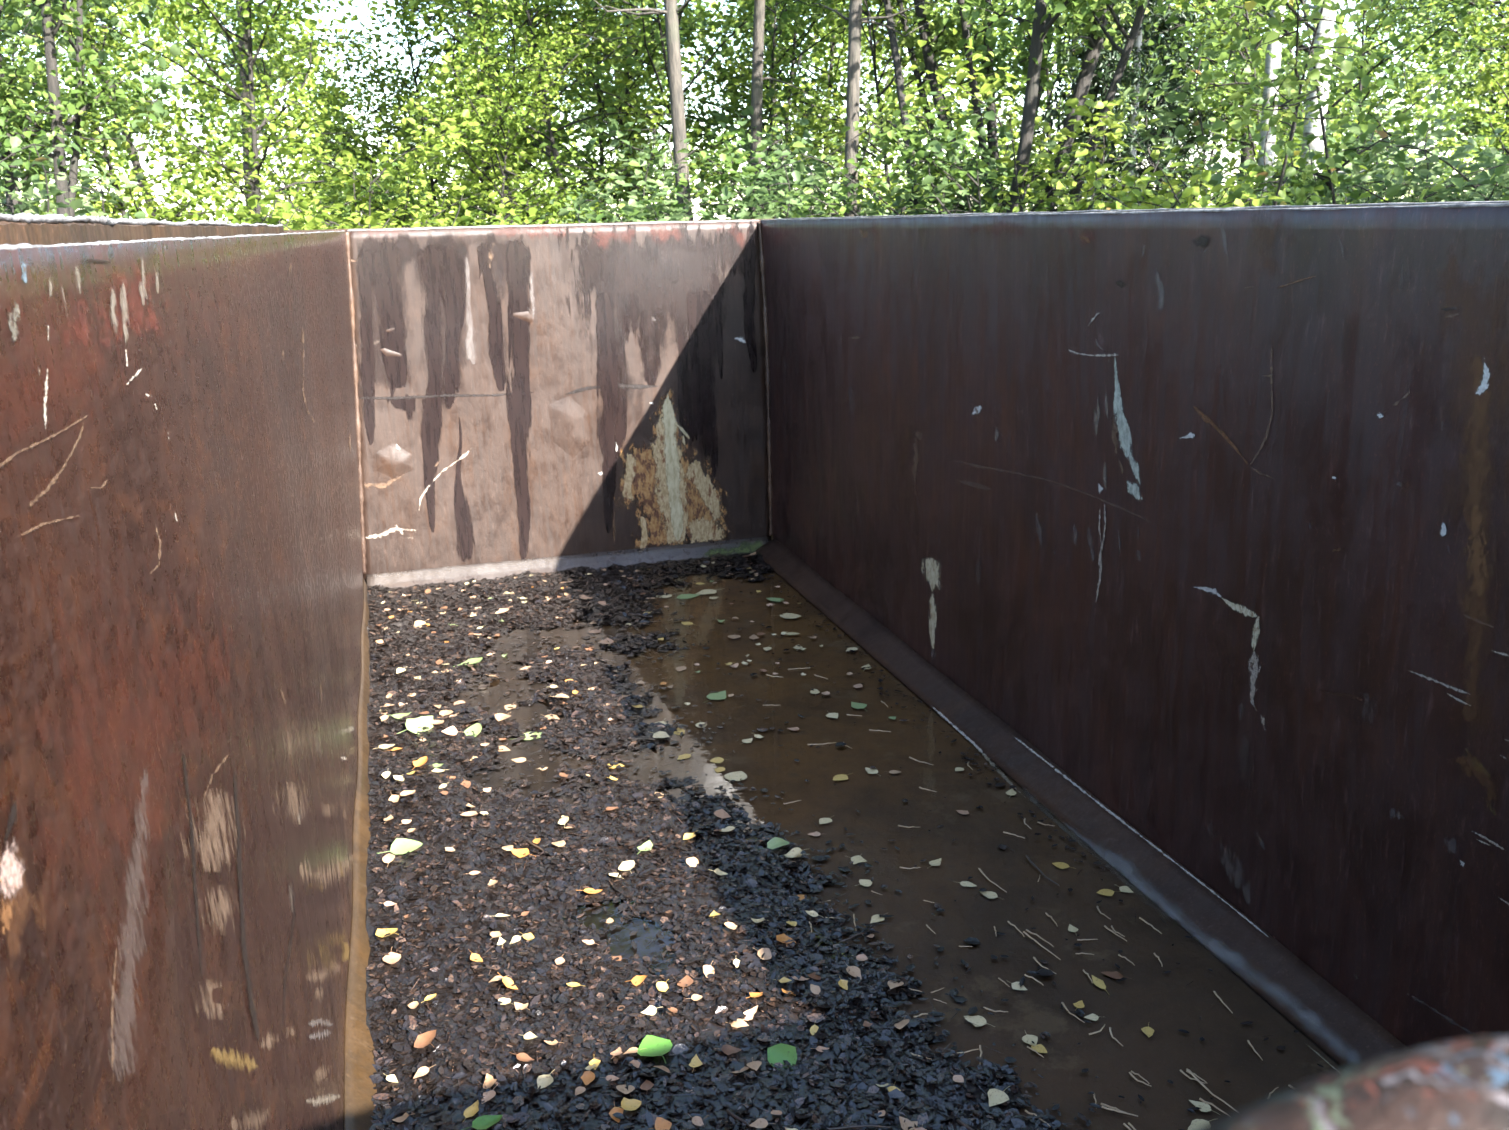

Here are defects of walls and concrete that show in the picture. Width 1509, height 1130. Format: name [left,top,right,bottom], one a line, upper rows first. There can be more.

damp [357,235,532,562]
damp [558,220,757,533]
peeling [598,389,729,548]
peeling [1094,359,1142,500]
peeling [1194,587,1266,730]